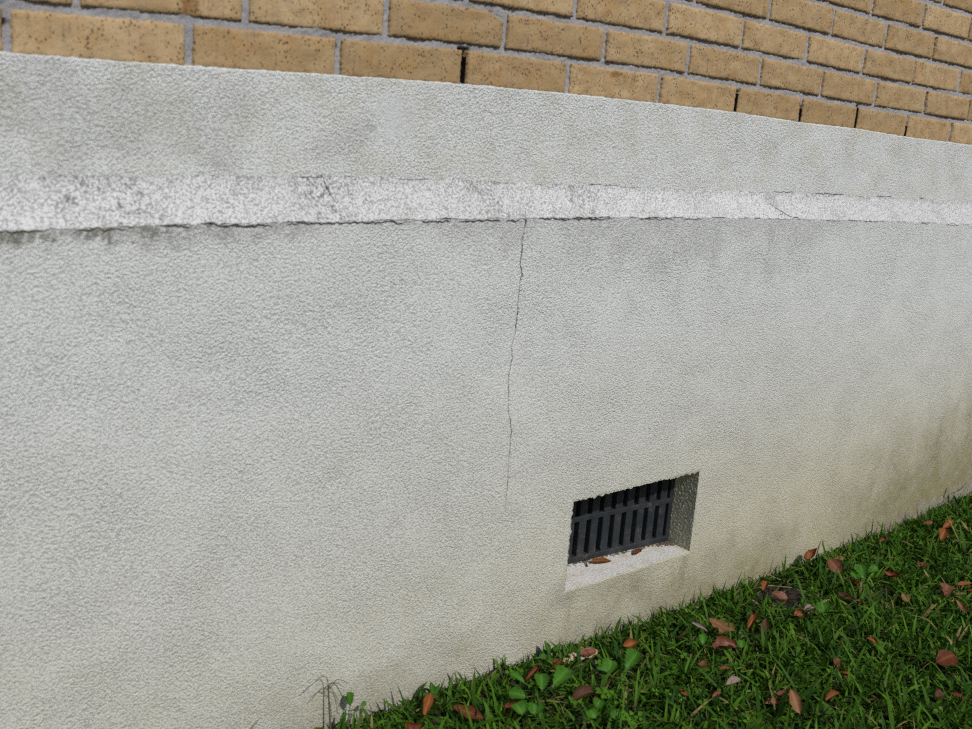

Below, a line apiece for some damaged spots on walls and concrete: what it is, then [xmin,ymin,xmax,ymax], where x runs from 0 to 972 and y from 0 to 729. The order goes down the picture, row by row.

crack [0,227,40,235]
crack [74,225,128,233]
crack [160,177,610,510]